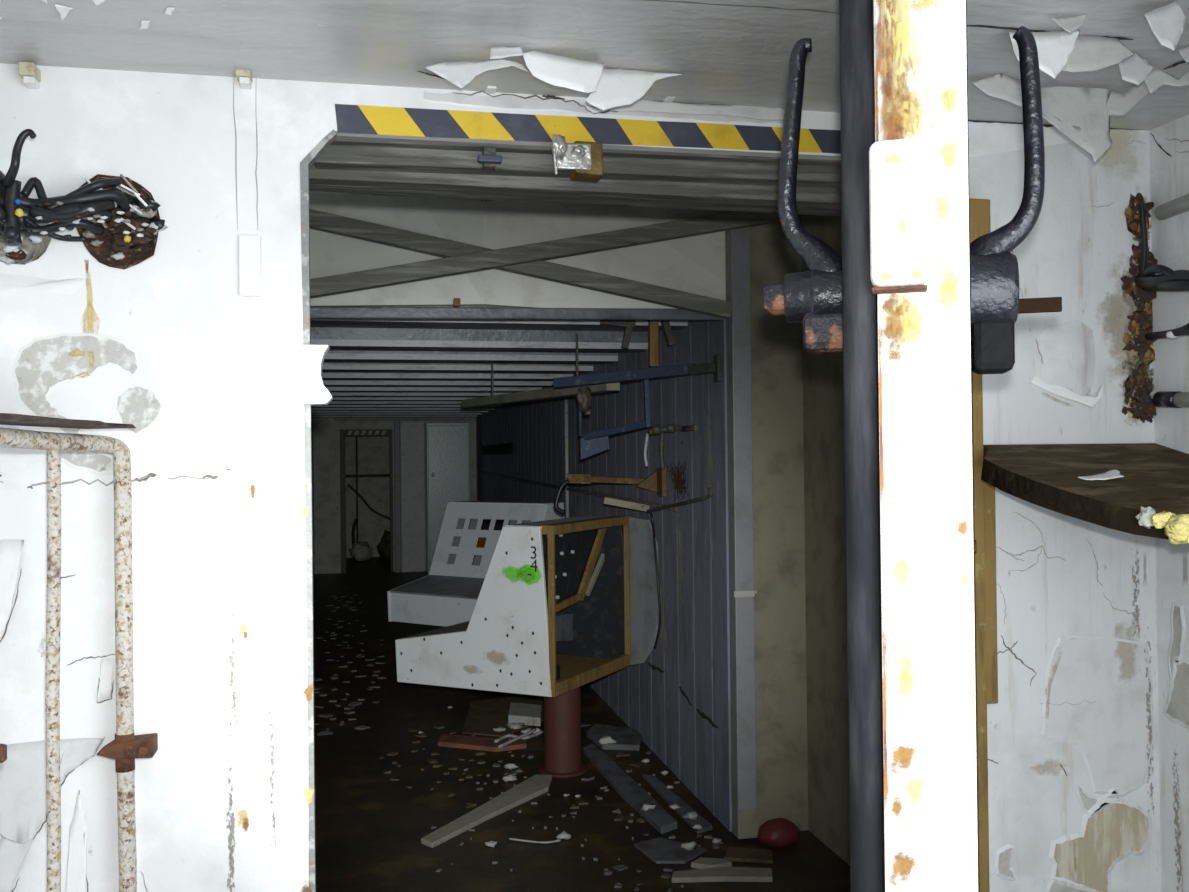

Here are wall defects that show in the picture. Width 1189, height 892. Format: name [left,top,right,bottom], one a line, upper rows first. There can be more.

peeling [421,46,785,126]
corrosion [875,0,958,141]
corrosion [940,144,958,167]
peeling [1032,0,1189,162]
corrosion [1120,192,1158,423]
spalling [12,332,165,438]
crack [996,512,1096,705]
crack [1086,538,1139,622]
peeling [0,740,47,892]
corrosion [883,635,924,816]
corrosion [892,852,916,885]
peeling [1041,602,1189,892]